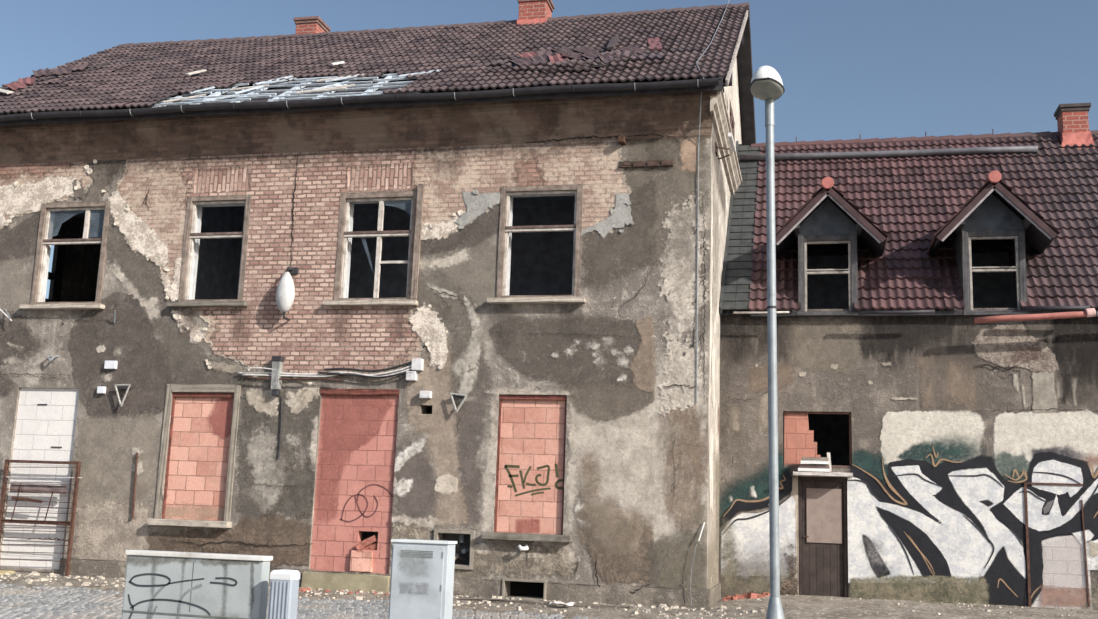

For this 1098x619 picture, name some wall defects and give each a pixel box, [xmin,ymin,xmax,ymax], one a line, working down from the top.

leakage [68,212,391,519]
spalling [0,140,635,465]
leakage [393,121,805,589]
leakage [859,316,967,410]
spalling [971,324,1059,374]